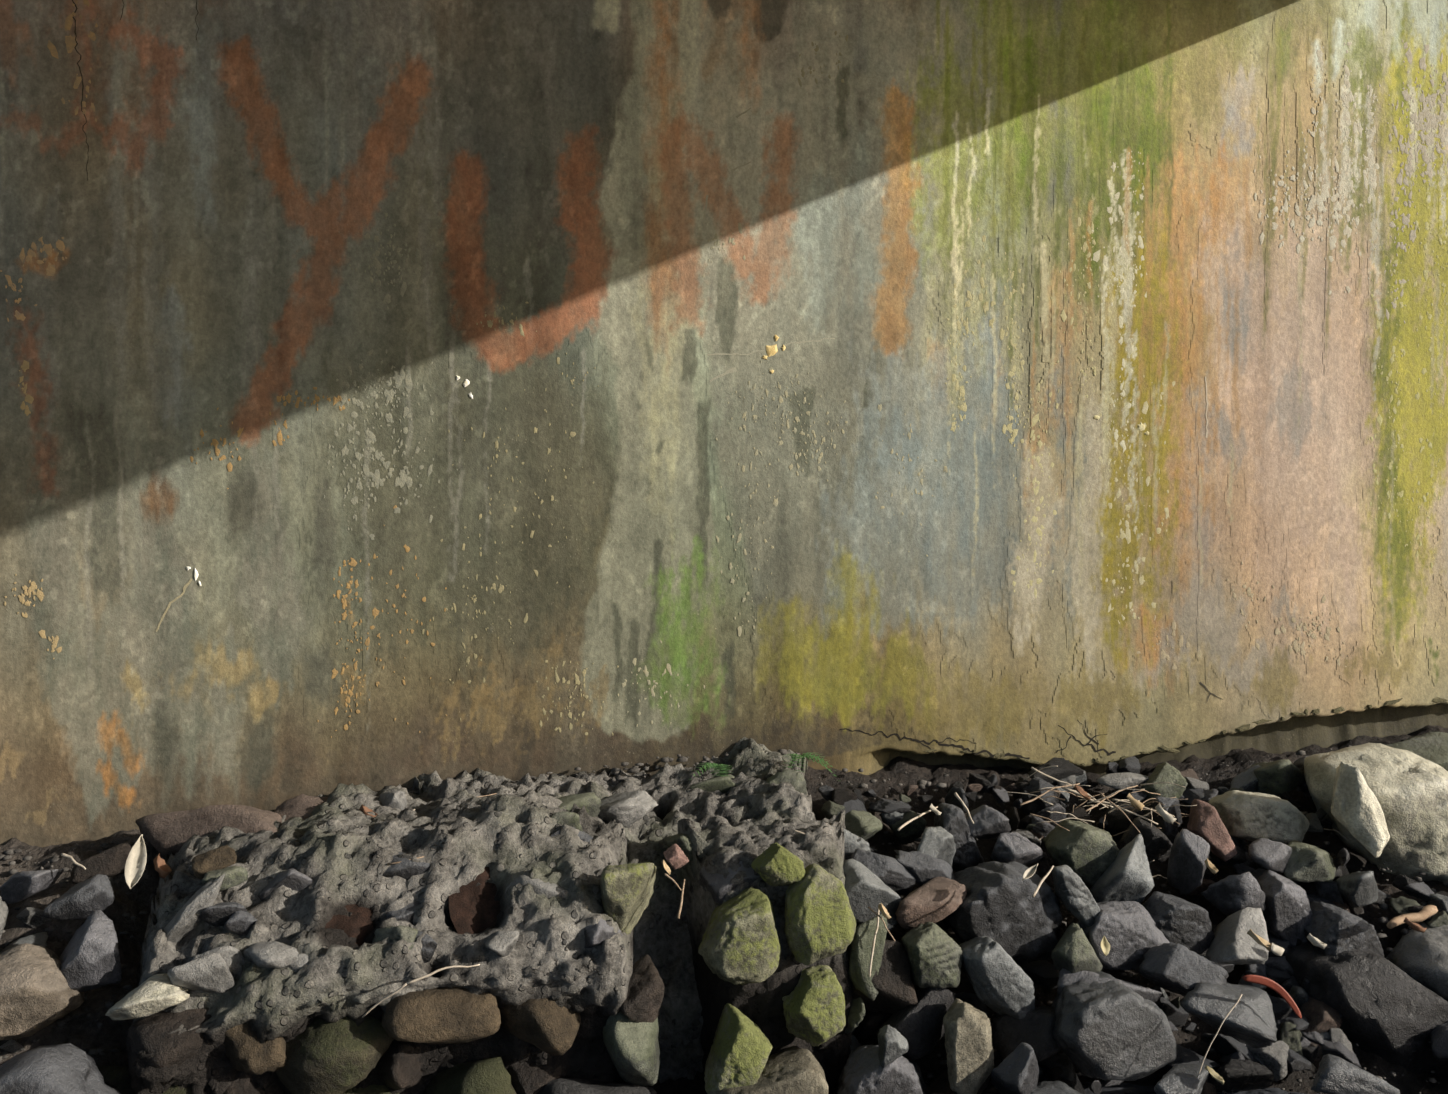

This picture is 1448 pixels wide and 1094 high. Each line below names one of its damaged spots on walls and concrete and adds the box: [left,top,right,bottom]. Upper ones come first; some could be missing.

water stain [0,0,1332,848]
water stain [1307,0,1448,602]
crack [839,720,1116,759]